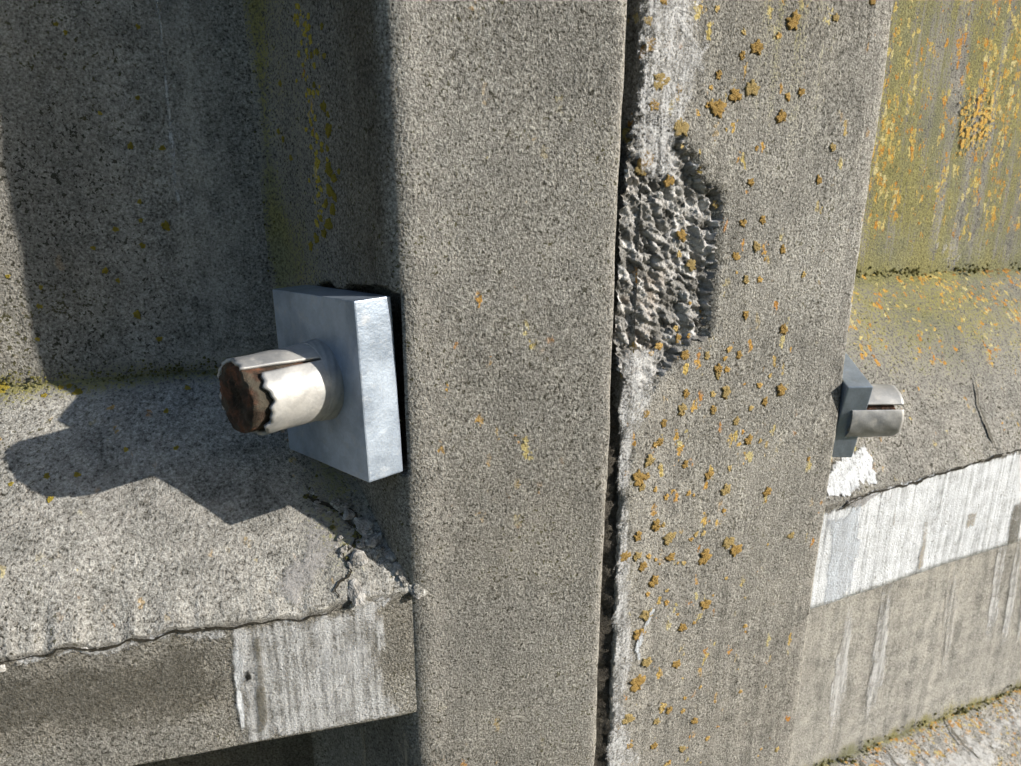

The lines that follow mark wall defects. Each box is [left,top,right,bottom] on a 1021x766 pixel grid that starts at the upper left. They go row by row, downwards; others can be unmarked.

water stain [953,89,999,163]
spalling [612,103,725,399]
crack [0,487,428,672]